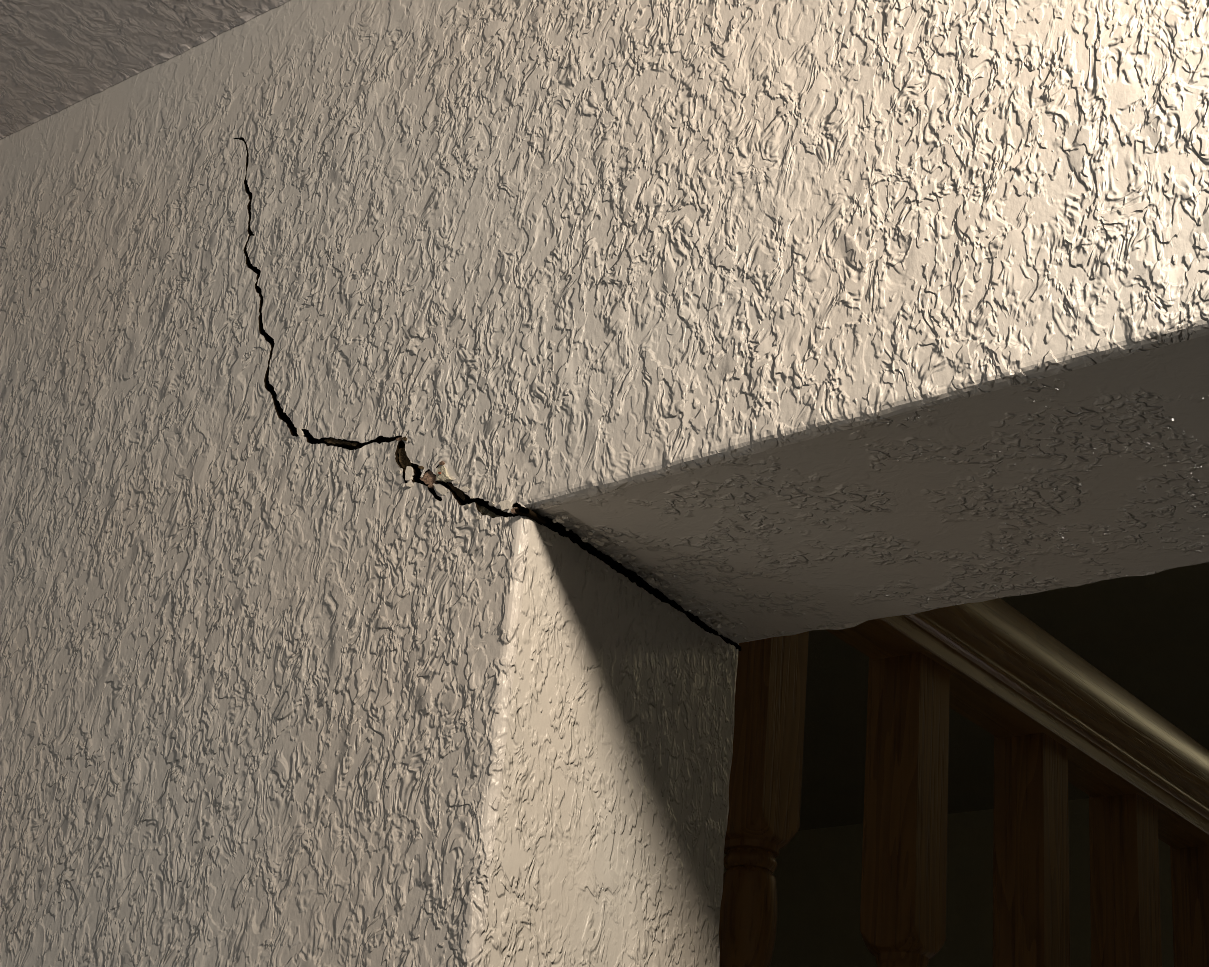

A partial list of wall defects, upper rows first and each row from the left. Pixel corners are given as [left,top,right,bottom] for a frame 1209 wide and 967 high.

crack [234,137,741,654]